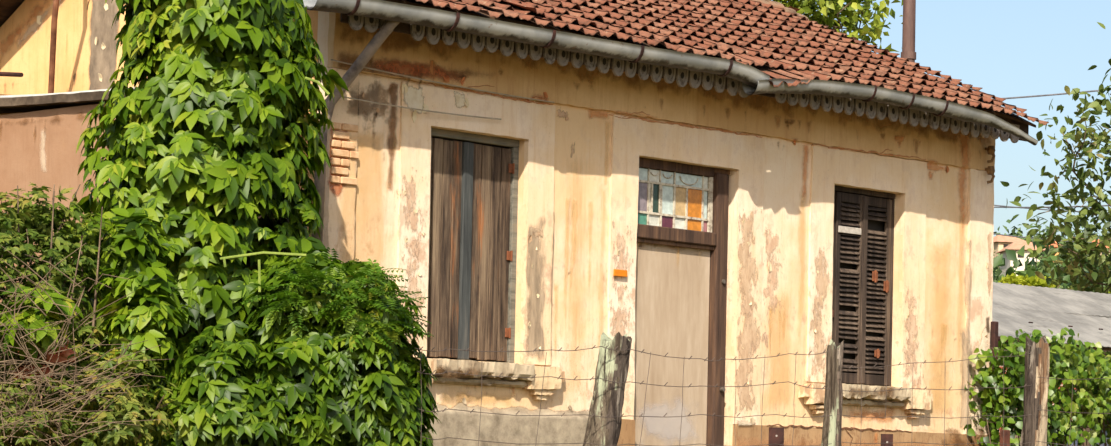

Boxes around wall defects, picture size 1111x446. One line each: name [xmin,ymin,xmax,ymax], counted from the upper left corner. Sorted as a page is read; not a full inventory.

leakage [74,0,119,90]
flaking render [329,122,359,195]
leakage [339,26,989,221]
peeling [526,220,545,359]
peeling [736,212,780,425]